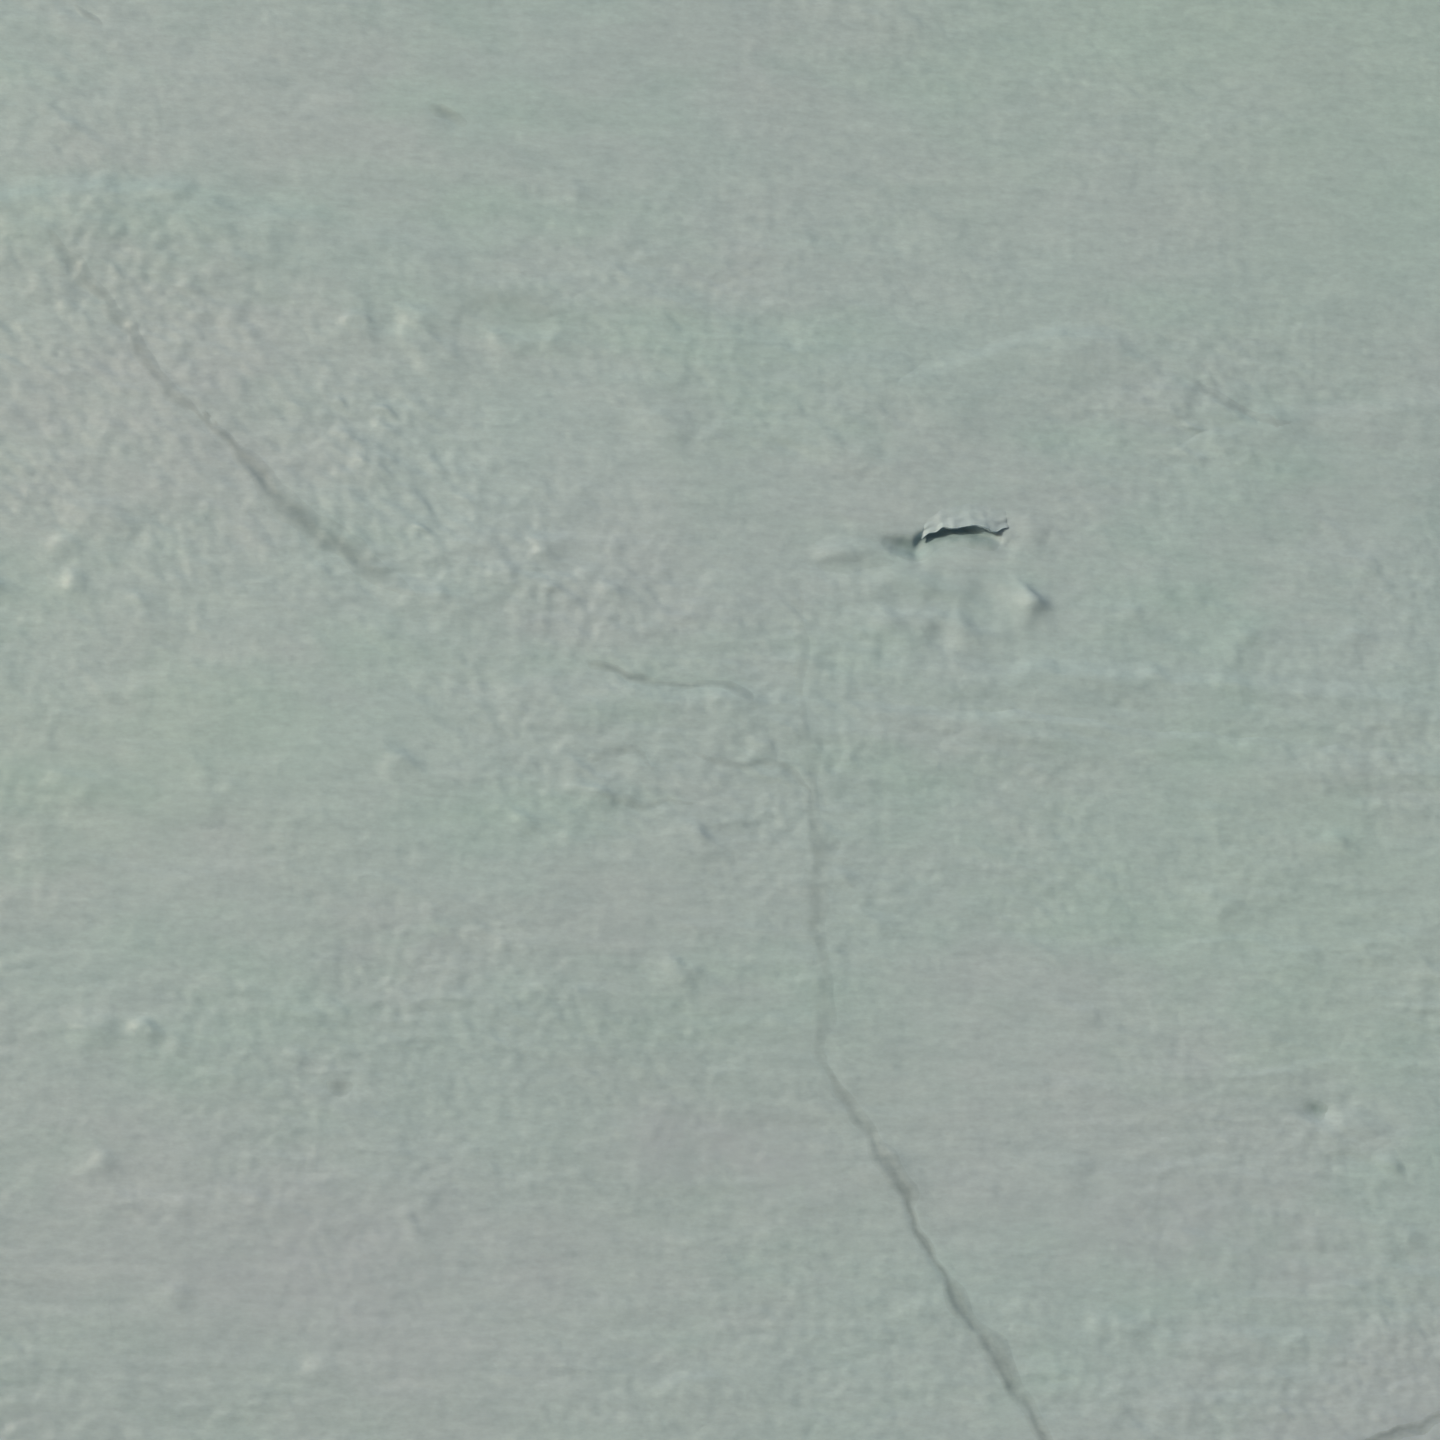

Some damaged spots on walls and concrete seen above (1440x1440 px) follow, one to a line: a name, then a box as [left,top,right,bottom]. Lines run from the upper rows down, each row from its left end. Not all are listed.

flaking render [802,504,1009,575]
crack [588,660,754,701]
crack [586,744,693,812]
crack [694,577,1053,1440]
crack [1365,1410,1440,1440]